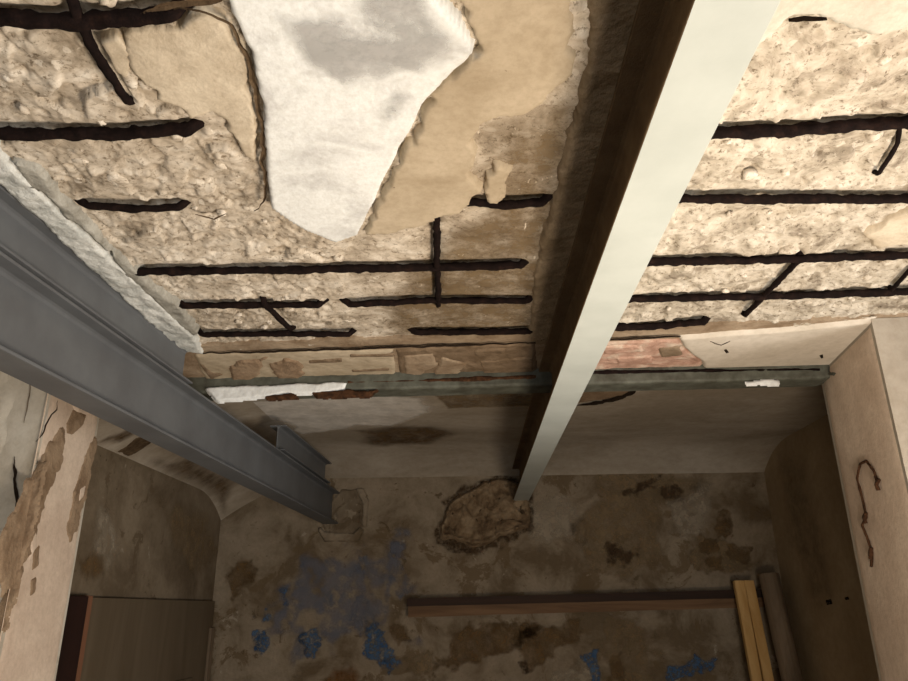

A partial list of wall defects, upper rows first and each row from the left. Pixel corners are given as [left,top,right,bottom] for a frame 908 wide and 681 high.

spalling [0,0,590,434]
spalling [595,14,908,369]
crack [12,456,20,506]
crack [24,385,58,439]
peeling [0,406,94,633]
damp [367,428,445,444]
spalling [435,476,533,553]
damp [531,473,710,580]